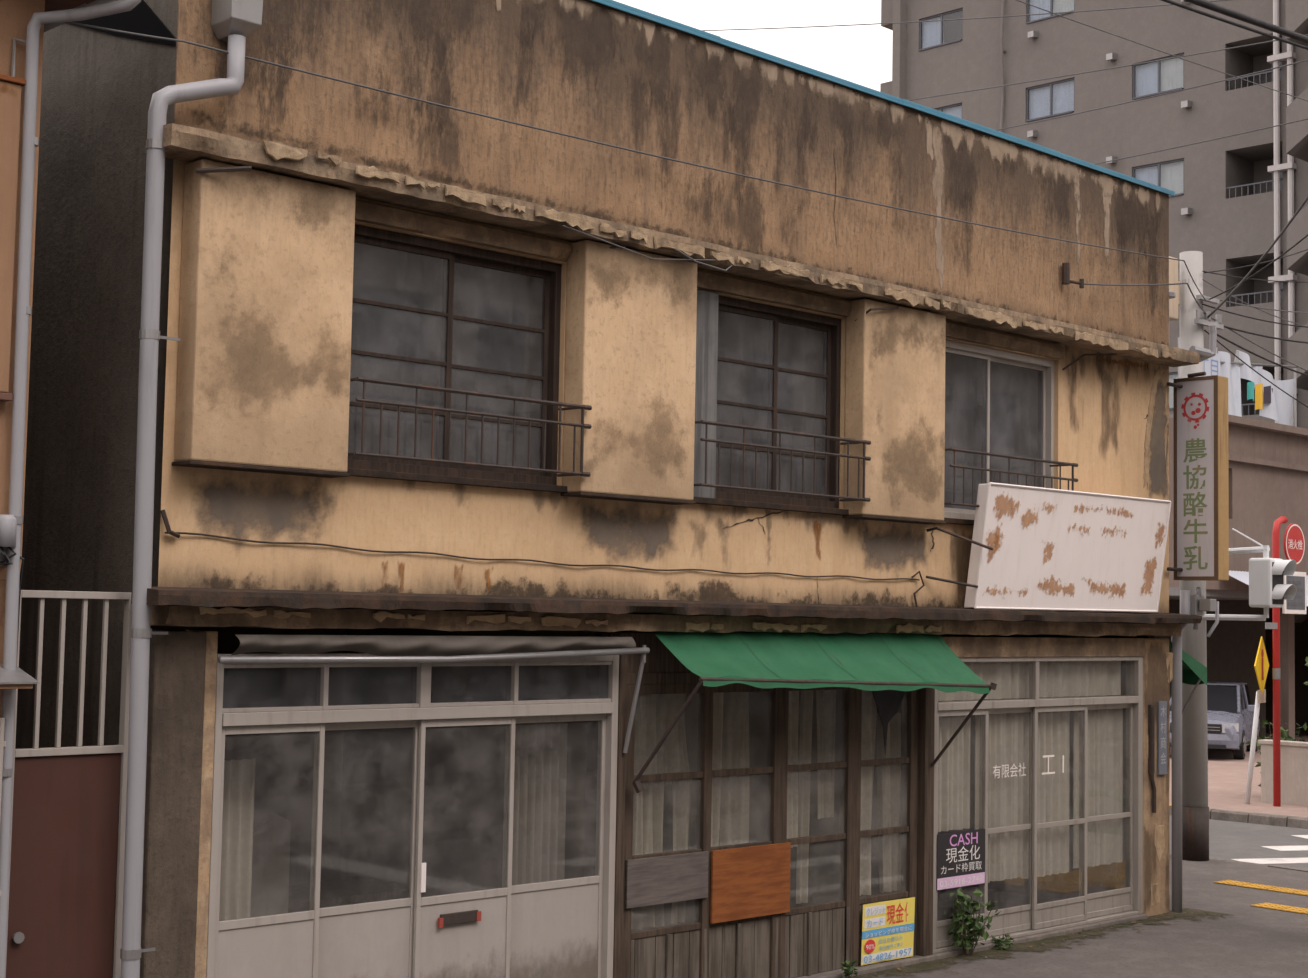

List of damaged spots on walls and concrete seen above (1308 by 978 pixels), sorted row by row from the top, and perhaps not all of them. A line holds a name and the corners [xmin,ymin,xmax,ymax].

damp [560,0,1161,310]
damp [361,157,612,221]
spalling [262,141,863,293]
damp [223,320,345,400]
damp [1065,345,1130,448]
damp [885,432,943,500]
damp [199,482,331,542]
damp [583,506,676,558]
peeling [466,614,608,628]
peeling [685,622,724,633]
peeling [752,622,827,633]
peeling [896,623,941,633]